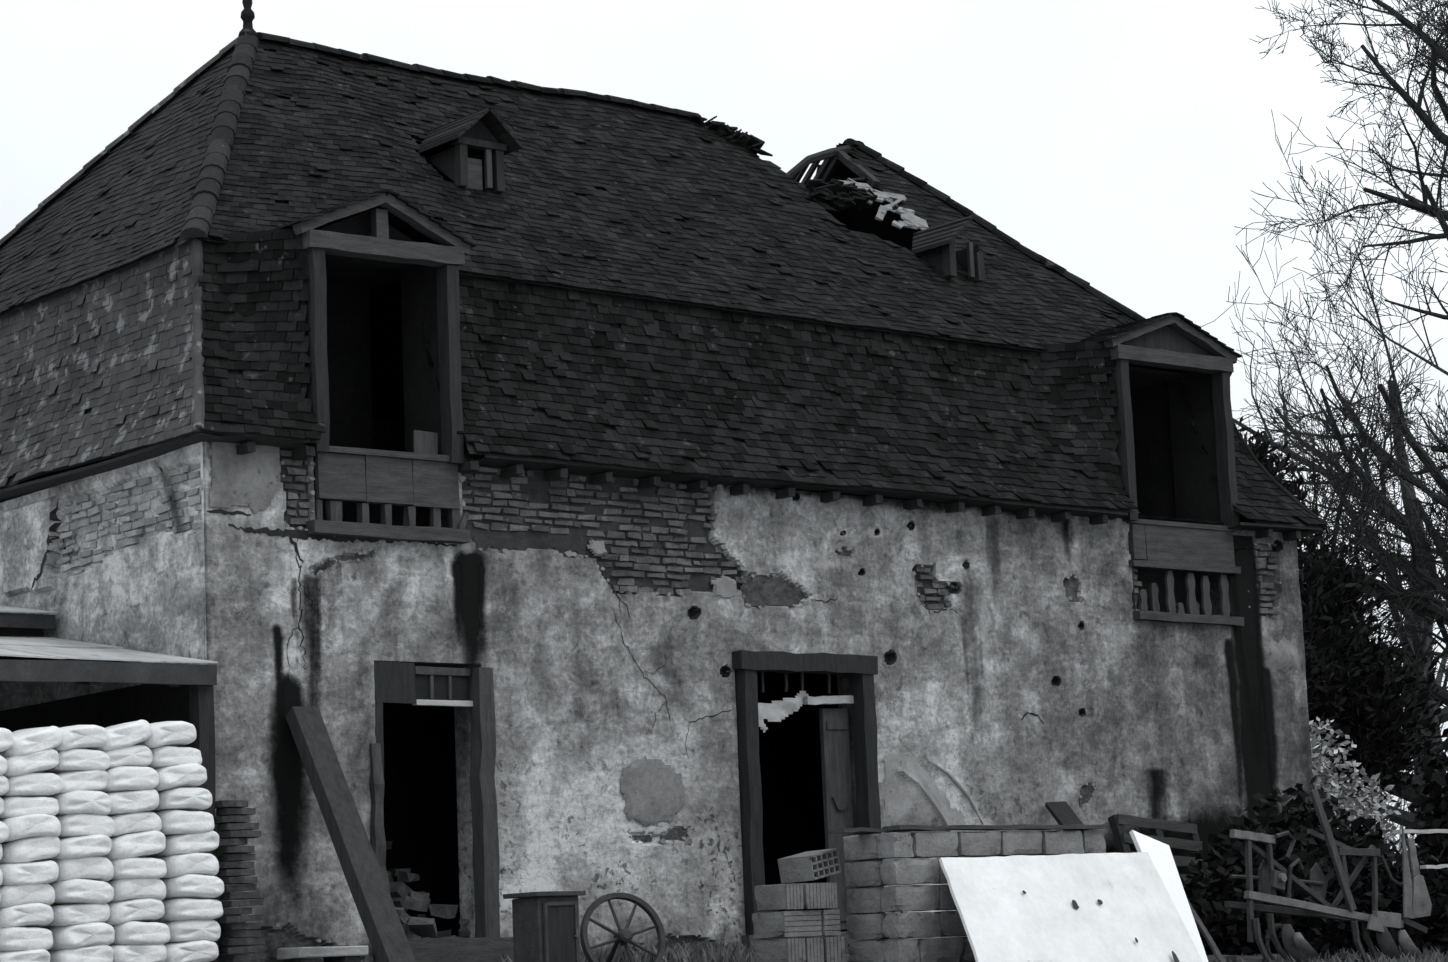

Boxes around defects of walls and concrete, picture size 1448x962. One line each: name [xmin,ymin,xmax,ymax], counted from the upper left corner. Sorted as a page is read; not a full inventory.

flaking render [57,463,202,579]
flaking render [279,445,316,531]
damp [453,551,485,673]
flaking render [458,453,814,619]
flaking render [912,562,970,614]